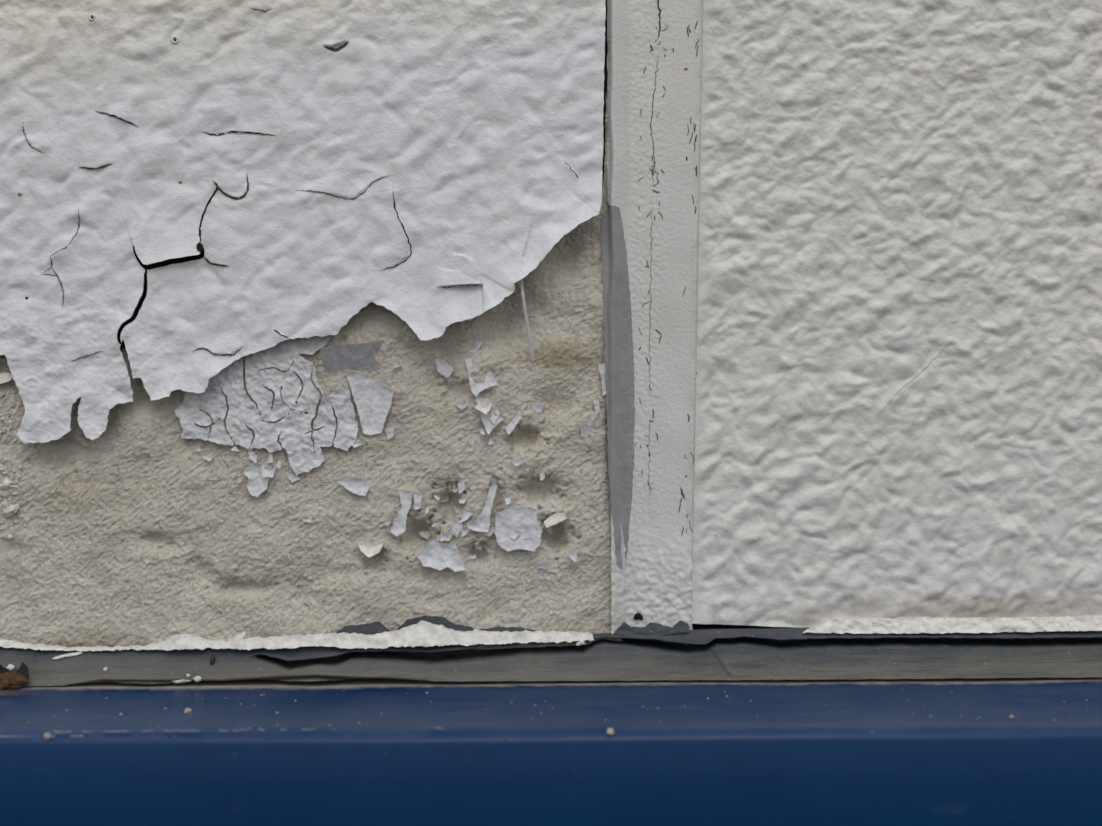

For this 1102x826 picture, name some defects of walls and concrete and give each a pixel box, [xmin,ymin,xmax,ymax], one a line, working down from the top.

crack [204,129,274,137]
crack [40,212,80,306]
crack [71,172,249,362]
crack [300,176,412,270]
peeling [0,94,689,650]